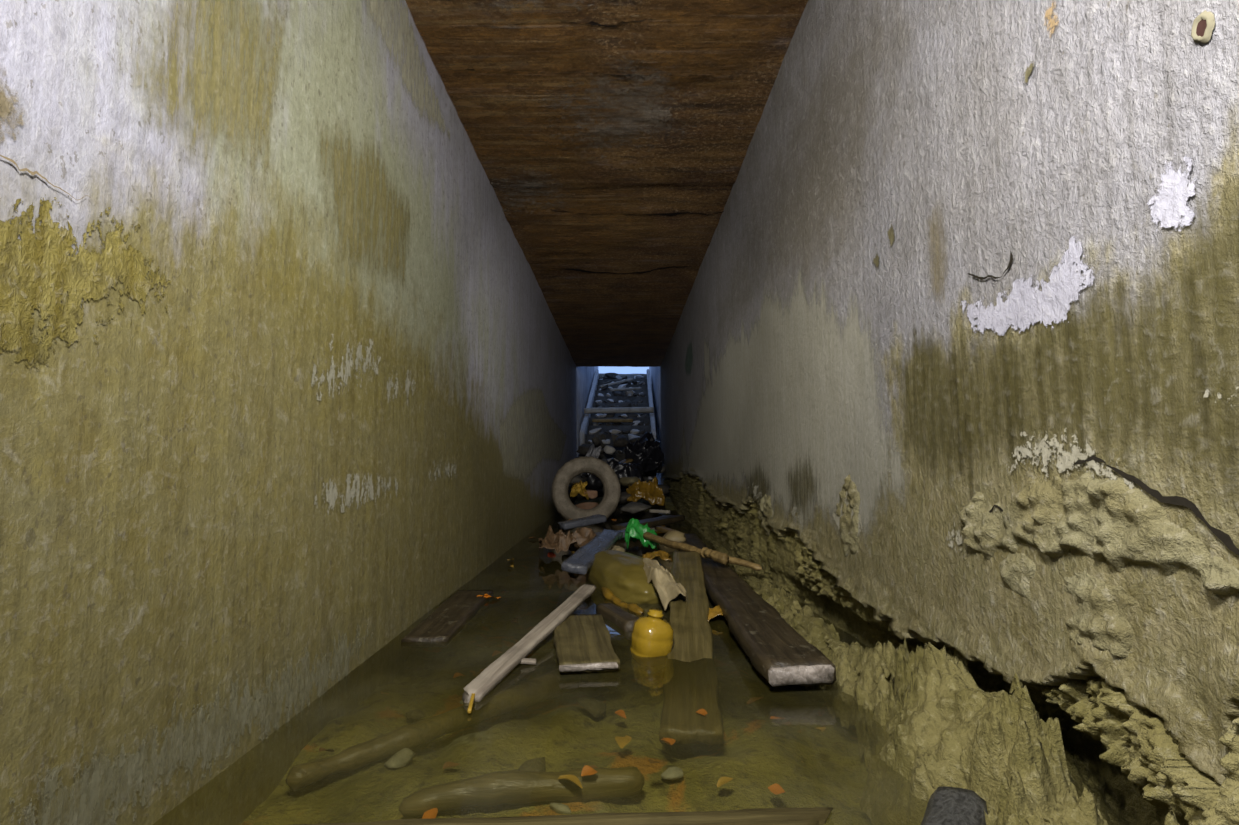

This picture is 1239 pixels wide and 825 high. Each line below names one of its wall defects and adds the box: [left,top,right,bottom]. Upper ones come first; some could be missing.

damp [0,71,24,141]
crack [0,155,91,200]
damp [137,0,282,167]
damp [321,133,410,279]
peeling [1141,153,1199,233]
peeling [0,194,171,370]
damp [681,270,905,536]
peeling [960,235,1095,337]
damp [905,207,1239,500]
peeling [314,473,398,514]
crack [1073,455,1239,555]
spalling [663,471,1239,825]